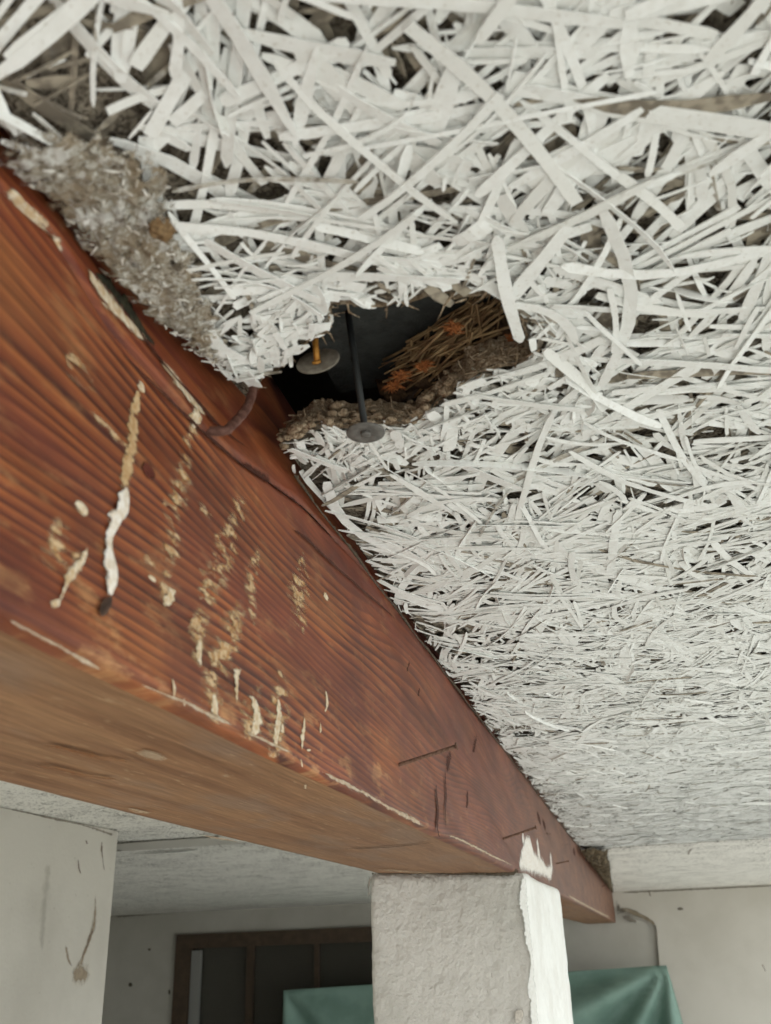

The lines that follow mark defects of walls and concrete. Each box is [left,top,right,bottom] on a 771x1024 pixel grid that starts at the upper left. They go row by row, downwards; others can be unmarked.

spalling [300,291,429,345]
spalling [445,290,489,300]
spalling [281,312,537,443]
peeling [142,684,230,724]